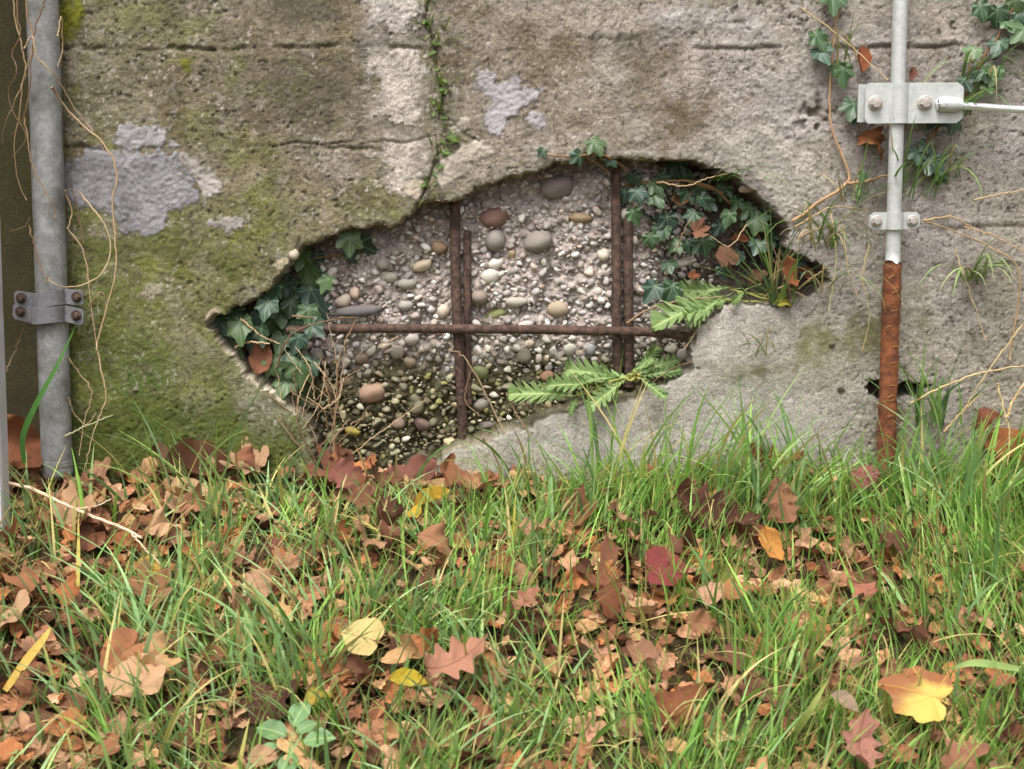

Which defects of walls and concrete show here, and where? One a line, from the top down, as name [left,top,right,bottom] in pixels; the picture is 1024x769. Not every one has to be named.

damp [354,0,431,197]
peeling [64,122,249,236]
damp [130,283,163,300]
spalling [205,67,836,472]
spalling [865,378,879,402]
corrosion [876,260,902,483]
spalling [897,381,932,400]